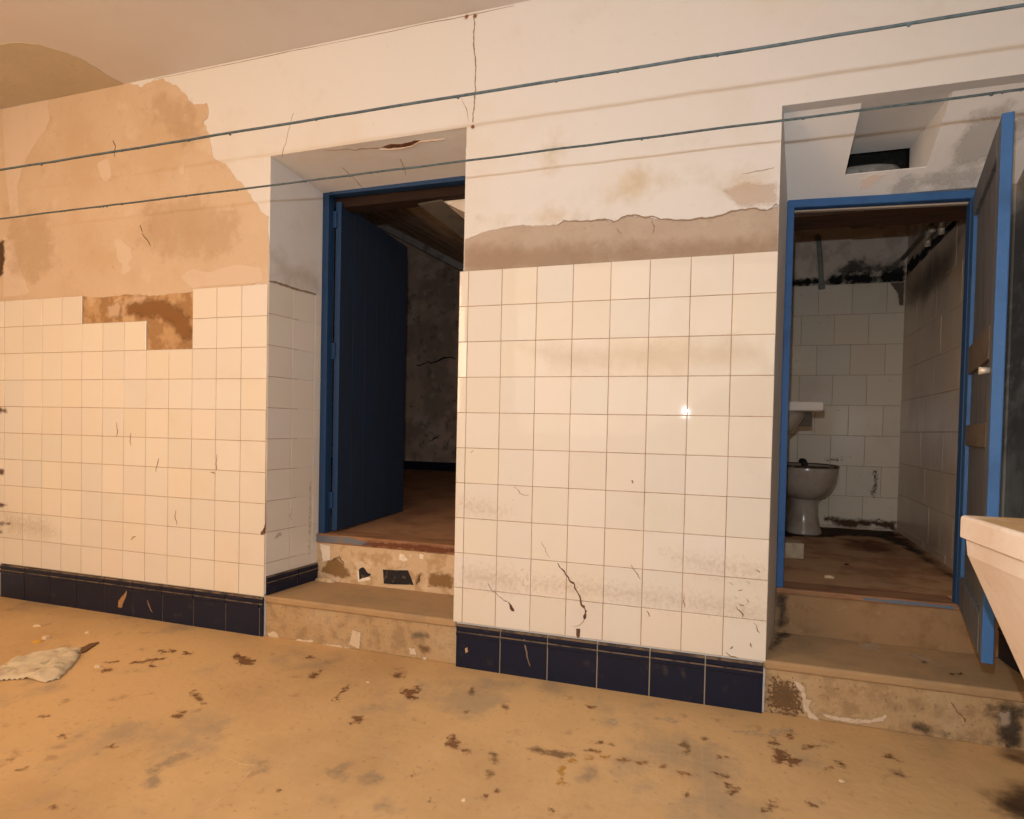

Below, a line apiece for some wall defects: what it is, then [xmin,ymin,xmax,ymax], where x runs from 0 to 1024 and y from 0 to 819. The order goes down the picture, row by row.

crack [157,6,511,122]
flaking render [324,139,445,151]
flaking render [0,42,270,350]
flaking render [464,167,779,271]
damp [792,221,959,305]
flaking render [316,535,453,588]
crack [541,541,587,638]